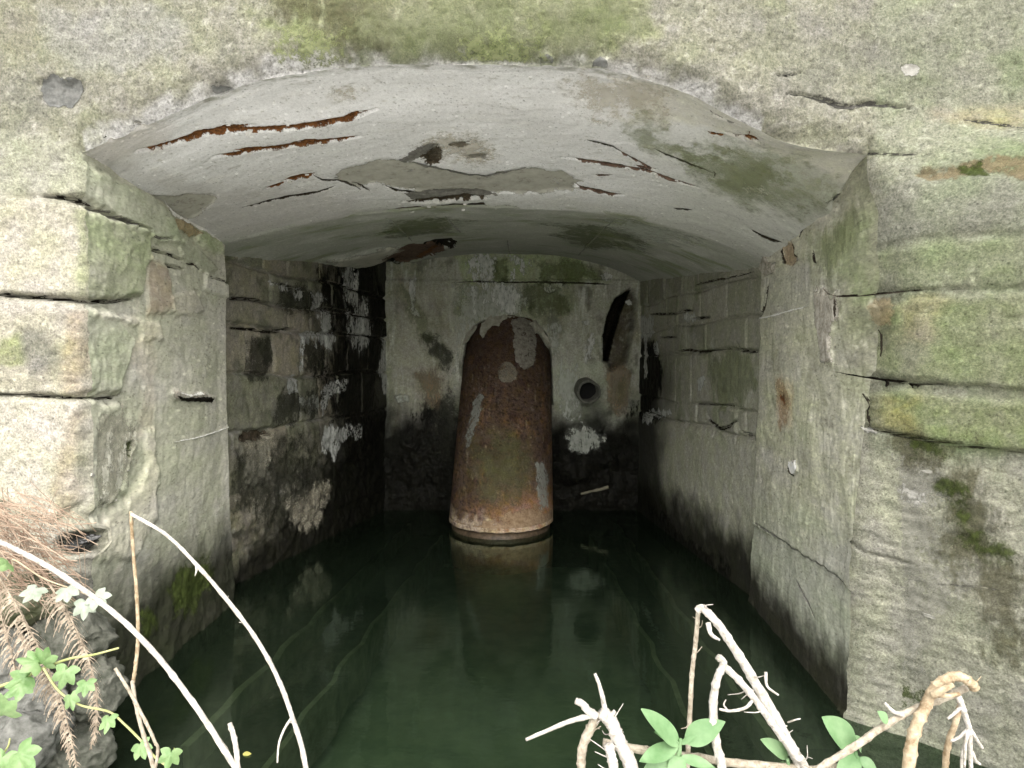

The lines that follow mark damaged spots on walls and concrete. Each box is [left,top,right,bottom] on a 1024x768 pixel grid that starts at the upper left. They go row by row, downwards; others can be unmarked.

crack [777,74,901,109]
crack [242,173,413,208]
peeling [336,142,583,212]
crack [575,140,716,211]
peeling [378,238,457,263]
water stain [231,266,484,529]
crack [755,523,862,614]